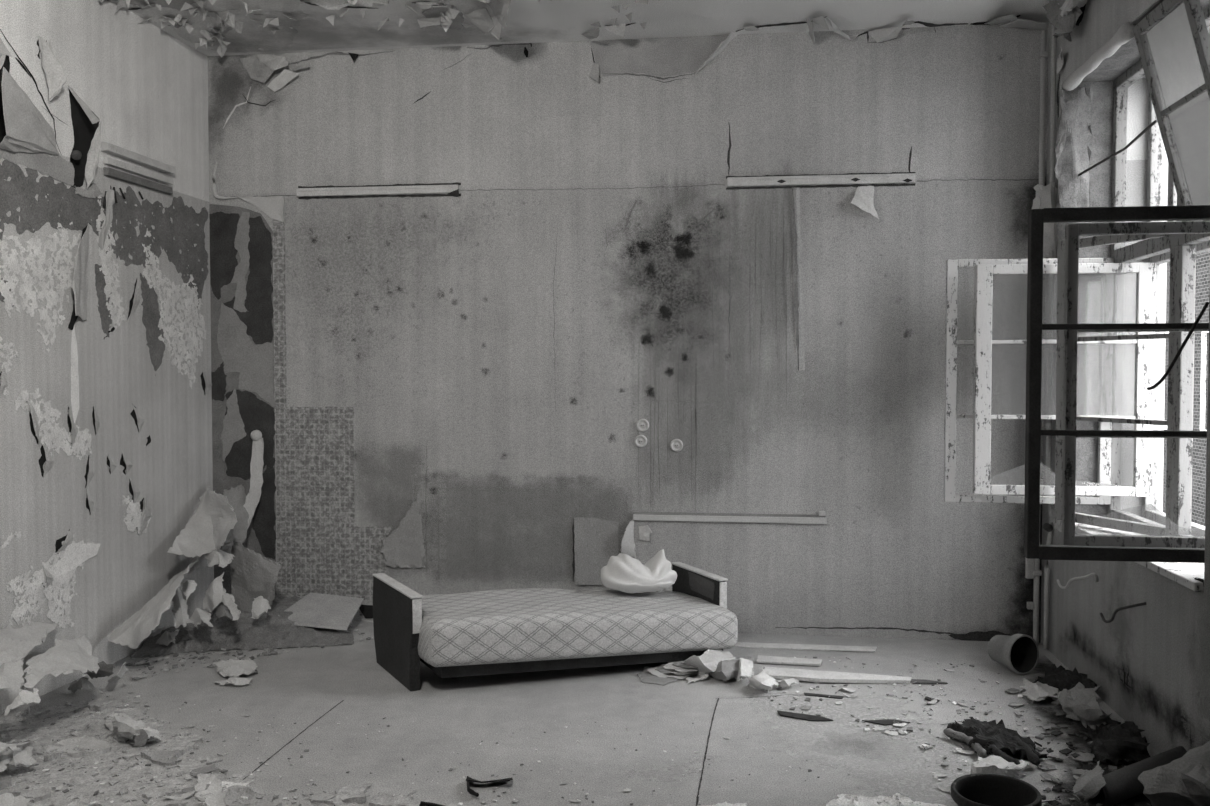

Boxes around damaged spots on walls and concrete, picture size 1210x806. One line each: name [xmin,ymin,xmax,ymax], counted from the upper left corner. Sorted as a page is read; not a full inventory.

peeling [107,0,511,92]
peeling [581,5,738,83]
peeling [984,0,1136,240]
peeling [0,53,285,562]
leakage [629,208,730,334]
leakage [638,336,697,523]
peeling [5,534,100,629]
peeling [214,546,232,593]
peeling [381,491,425,568]